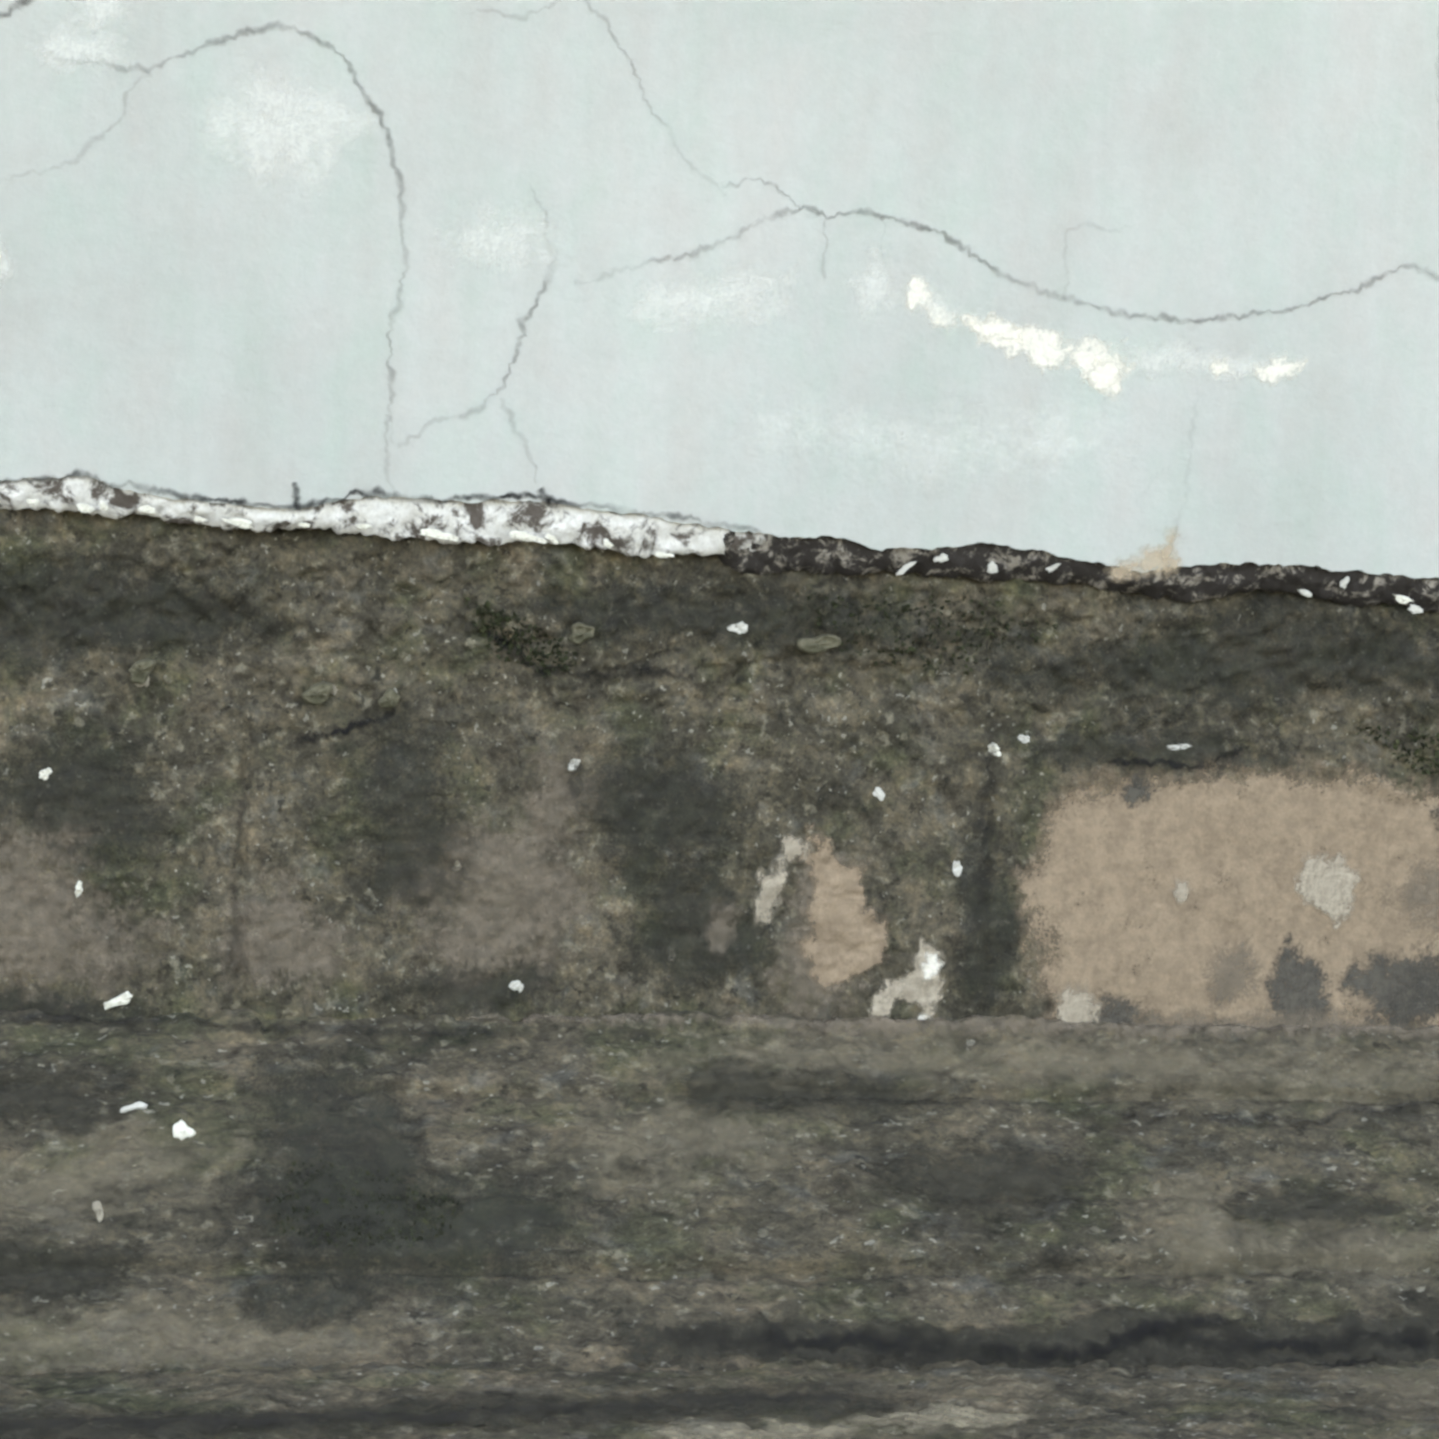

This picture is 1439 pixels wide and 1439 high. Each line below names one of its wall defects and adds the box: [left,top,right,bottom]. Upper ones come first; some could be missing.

crack [29,471,103,484]
crack [175,483,386,509]
crack [431,487,574,508]
flaking render [0,476,1439,614]
peeling [706,905,736,952]
peeling [755,825,888,987]